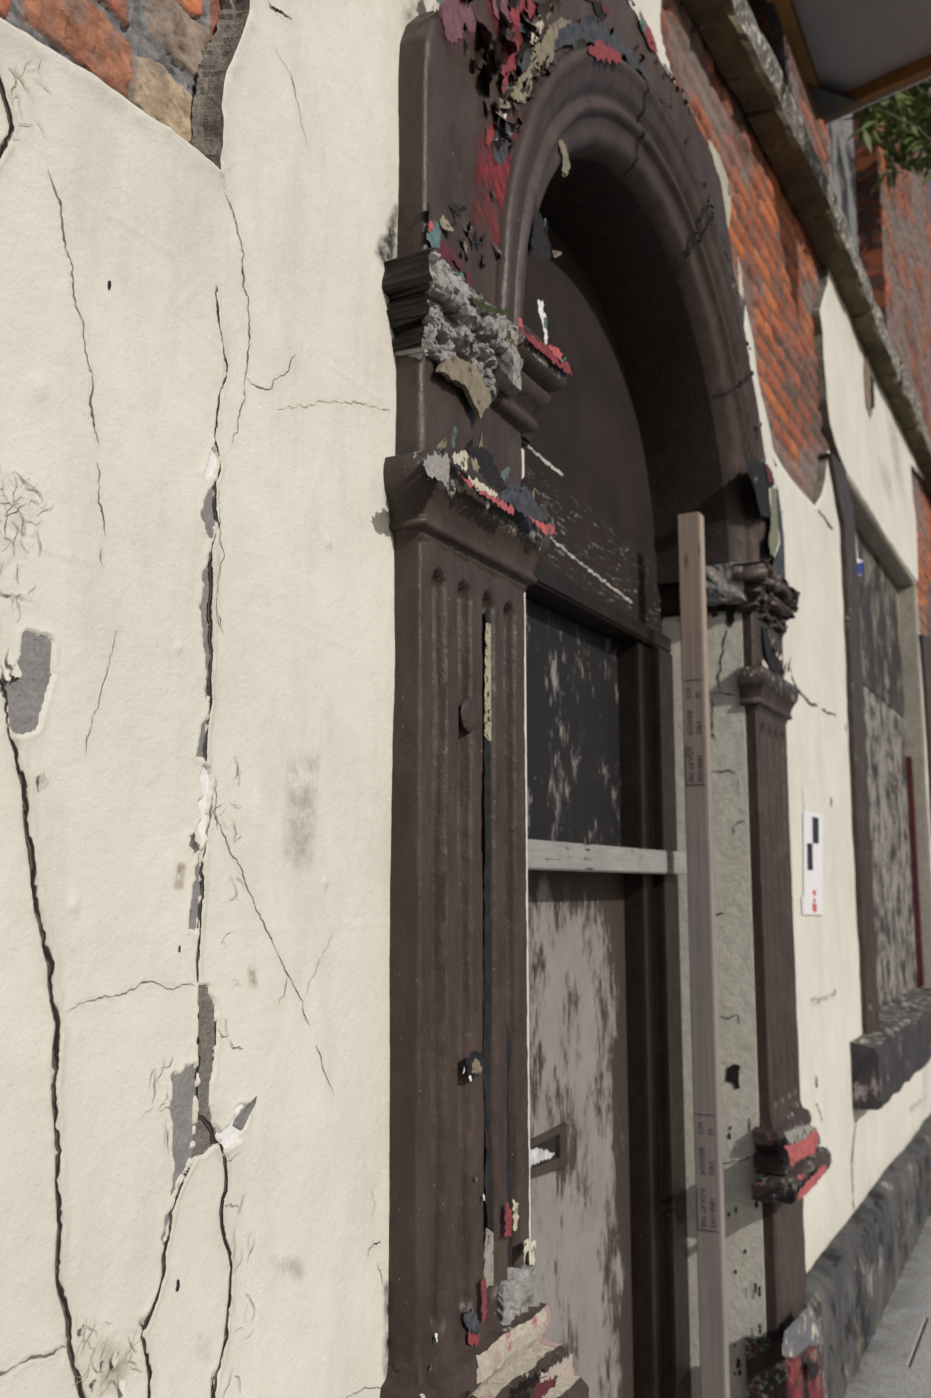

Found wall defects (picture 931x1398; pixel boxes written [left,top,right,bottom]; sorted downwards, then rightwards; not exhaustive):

crack [0,76,15,159]
spalling [0,0,247,168]
flaking render [382,0,831,676]
flaking render [877,112,931,439]
peeling [0,471,54,735]
flaking render [911,471,931,636]
crack [0,170,391,1398]
peeling [141,985,257,1242]
peeling [784,1124,827,1200]
spalling [464,1199,540,1346]
peeling [532,1353,574,1398]
peeling [782,1303,823,1398]